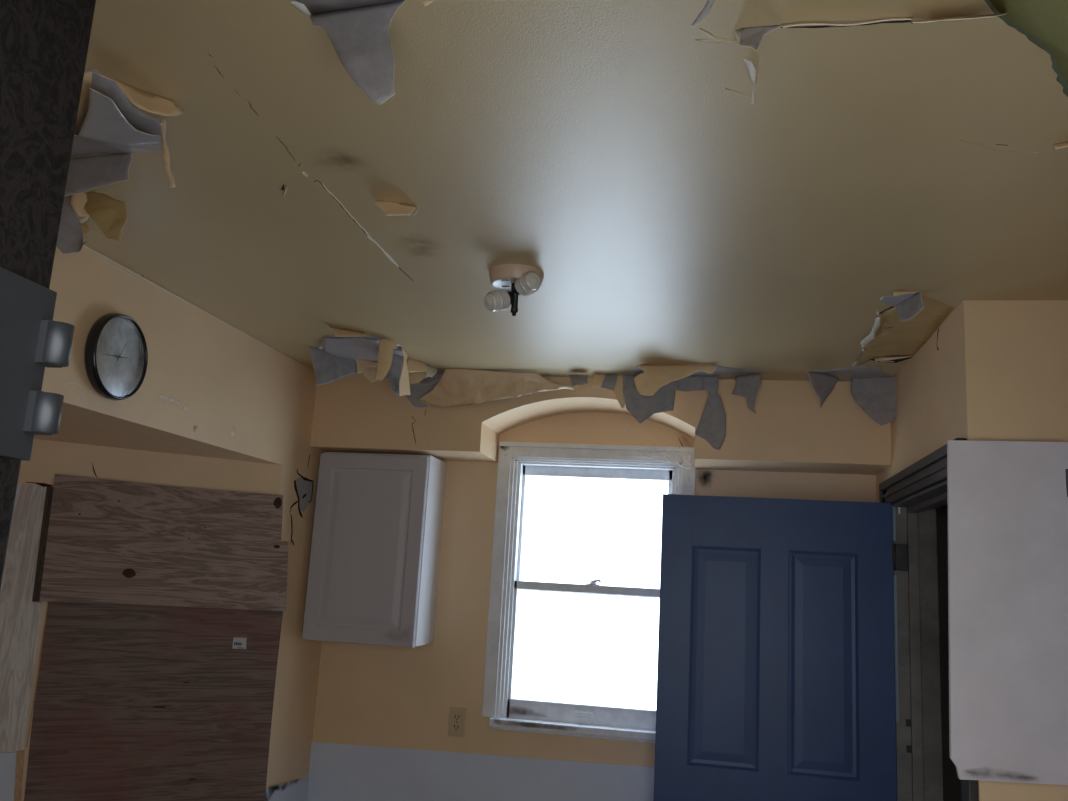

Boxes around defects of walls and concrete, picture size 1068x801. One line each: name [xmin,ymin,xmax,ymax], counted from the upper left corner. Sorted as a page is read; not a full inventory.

peeling [290,0,406,105]
peeling [691,0,782,104]
peeling [56,69,185,254]
crack [276,136,413,280]
peeling [308,326,439,408]
peeling [569,365,766,450]
peeling [808,290,954,426]